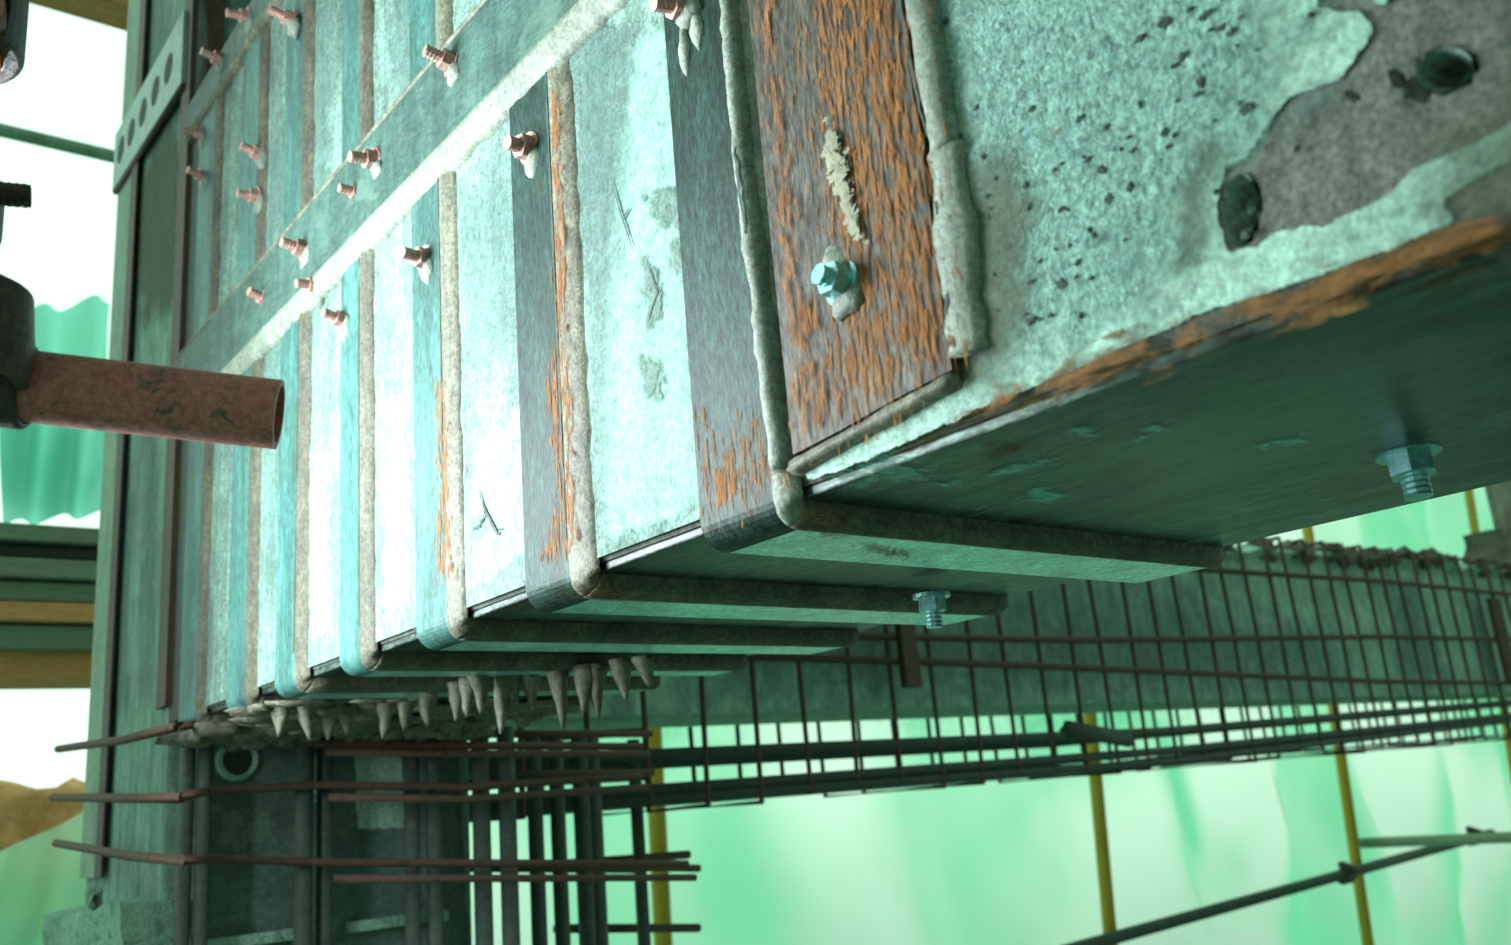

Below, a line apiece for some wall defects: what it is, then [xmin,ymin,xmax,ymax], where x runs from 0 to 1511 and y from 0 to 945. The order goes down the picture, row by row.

rust [539,90,579,566]
rust [691,402,922,560]
rust [756,0,1511,462]
peeling [806,0,1511,479]